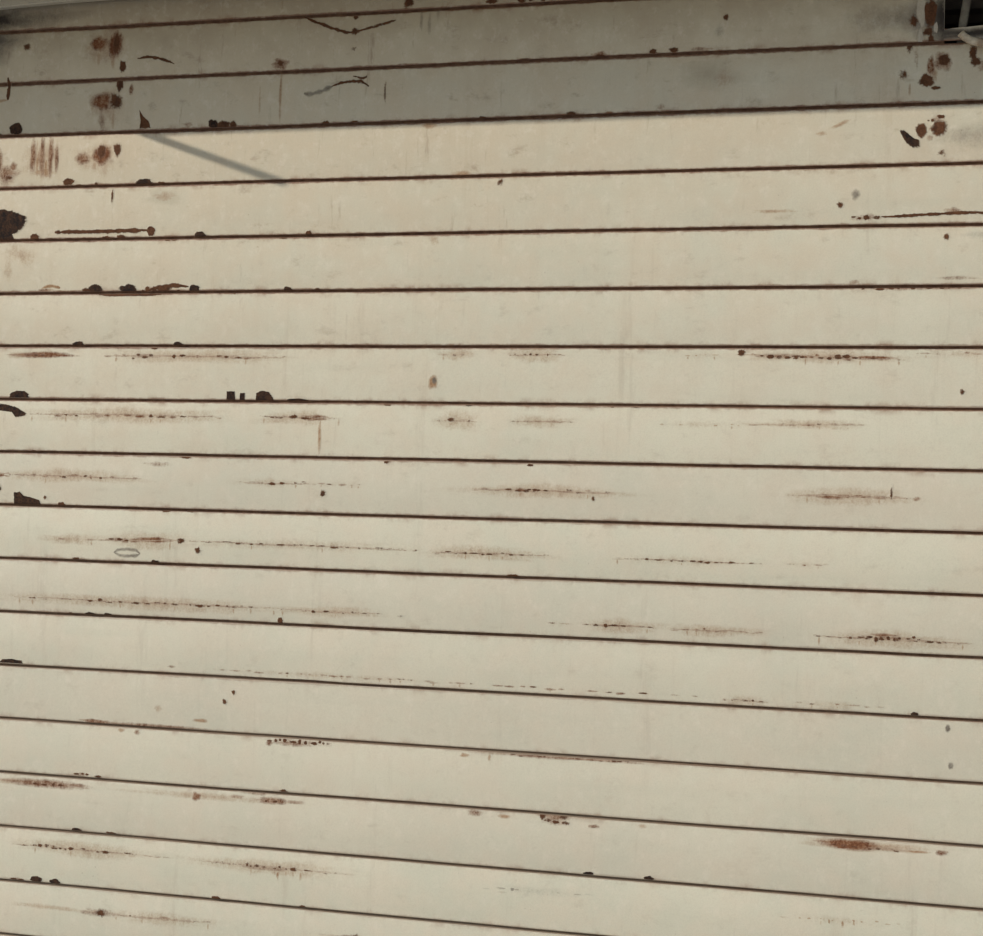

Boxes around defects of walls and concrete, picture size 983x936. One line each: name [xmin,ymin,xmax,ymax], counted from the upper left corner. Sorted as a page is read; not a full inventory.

rust [896,0,954,97]
rust [0,28,136,186]
rust [898,114,950,150]
rust [835,188,983,222]
rust [942,228,983,242]
rust [54,282,201,297]
rust [496,348,570,366]
rust [676,349,983,367]
rust [752,482,952,510]
rust [543,614,784,640]
rust [798,626,983,653]
rust [784,836,950,857]